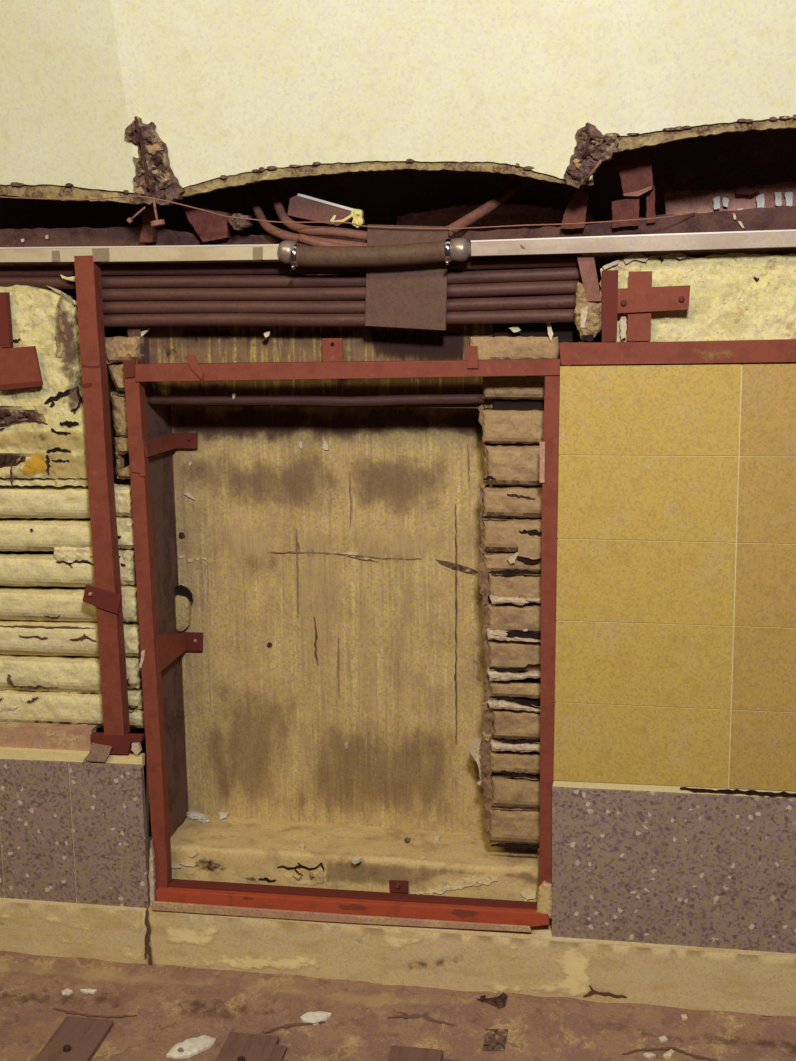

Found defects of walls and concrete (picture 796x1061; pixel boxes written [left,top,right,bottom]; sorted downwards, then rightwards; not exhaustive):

peeling [134,144,173,200]
peeling [567,132,611,182]
spalling [0,407,45,425]
spalling [0,455,26,468]
crack [346,472,354,524]
flaking render [507,535,542,564]
crack [270,530,420,692]
spalling [436,442,501,843]
crack [258,863,324,882]
crack [144,910,152,965]